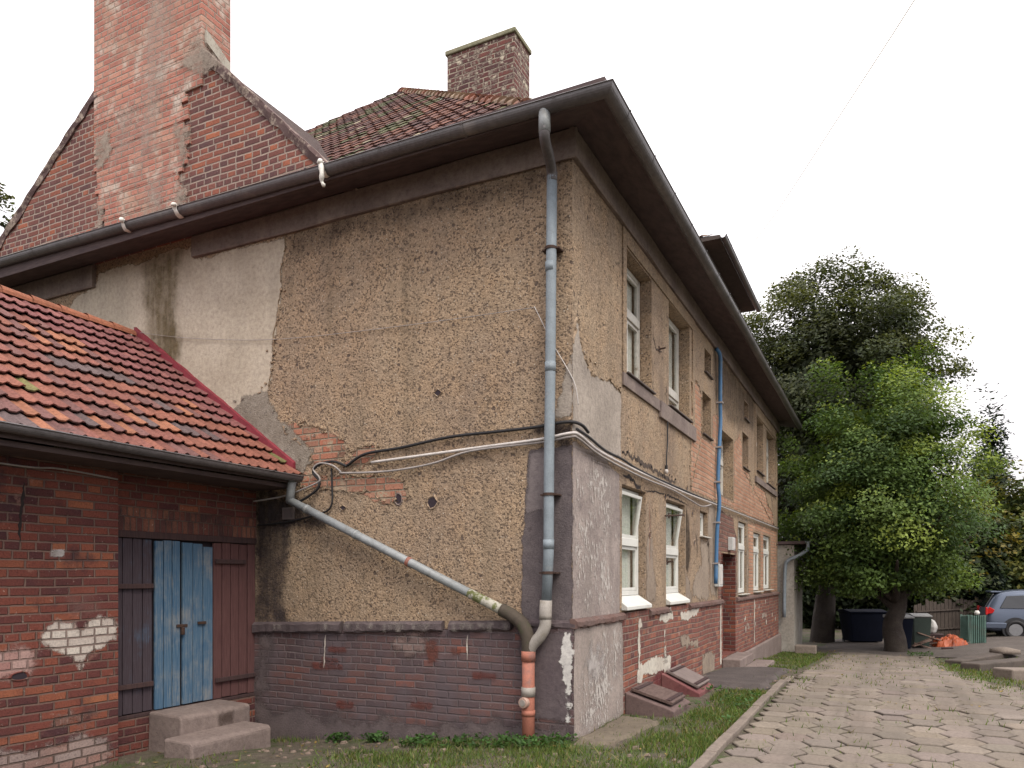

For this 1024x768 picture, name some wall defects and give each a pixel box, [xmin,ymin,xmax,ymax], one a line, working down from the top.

damp [145,253,178,359]
flaking render [234,338,413,511]
peeling [575,469,618,609]
flaking render [622,378,778,684]
peeling [559,629,621,734]